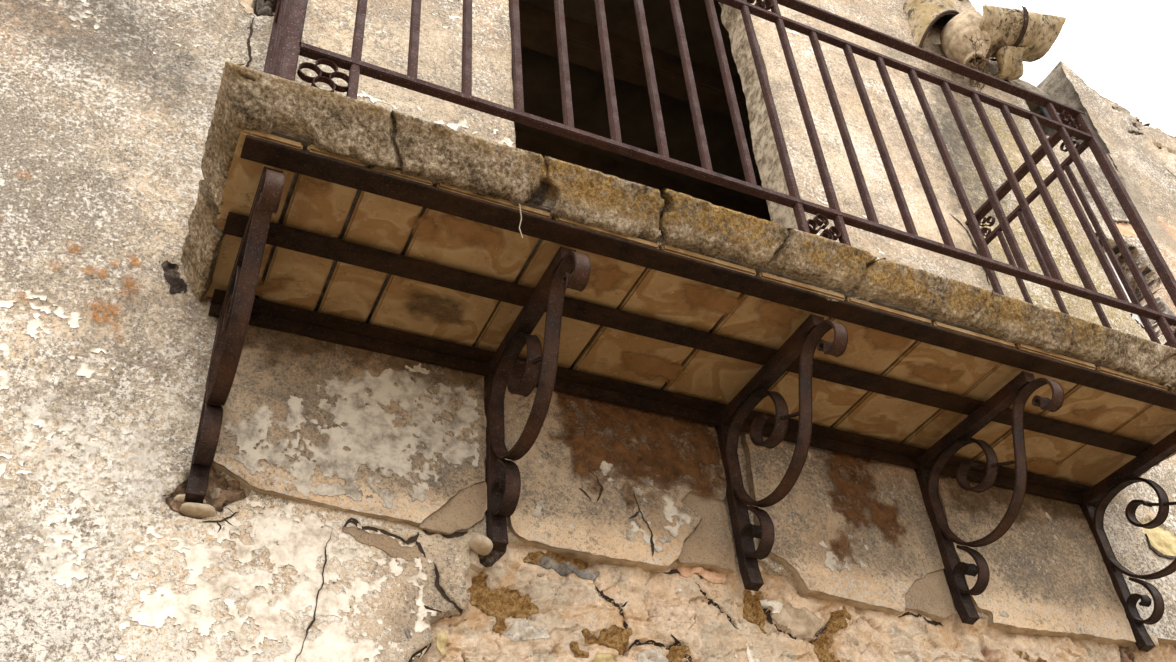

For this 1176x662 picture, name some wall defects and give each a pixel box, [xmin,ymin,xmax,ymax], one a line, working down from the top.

crack [240,1,255,67]
spalling [239,0,275,17]
corrosion [85,256,140,293]
peeling [0,288,83,340]
peeling [67,346,115,378]
peeling [0,411,56,477]
peeling [16,435,116,588]
crack [579,459,603,503]
flaking render [119,363,1176,662]
crack [295,510,468,662]
crack [629,493,740,630]
crack [763,608,828,642]